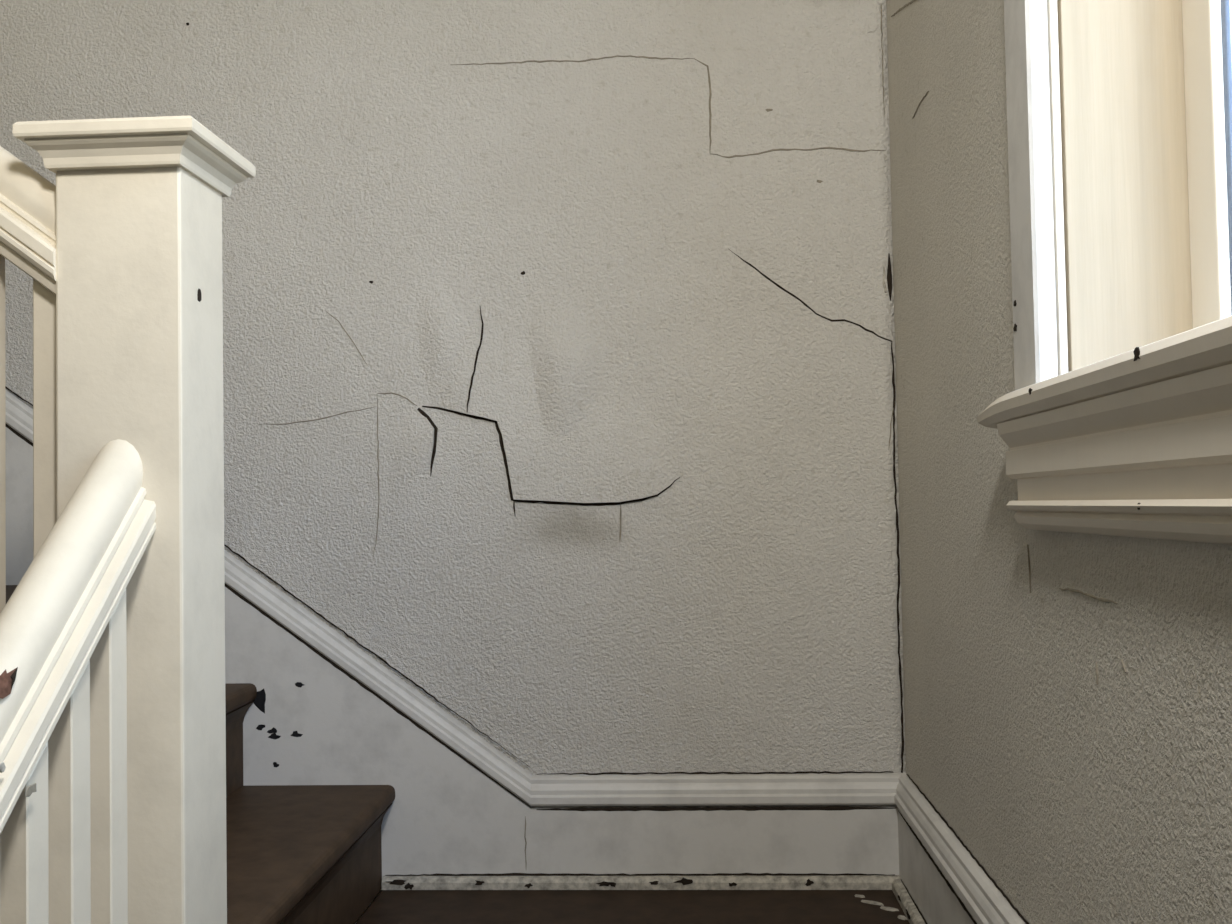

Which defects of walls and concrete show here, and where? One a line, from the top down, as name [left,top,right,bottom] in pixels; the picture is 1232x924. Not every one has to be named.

crack [453,55,884,158]
crack [880,0,917,115]
crack [5,386,33,446]
crack [224,249,1029,924]
crack [1027,545,1118,604]